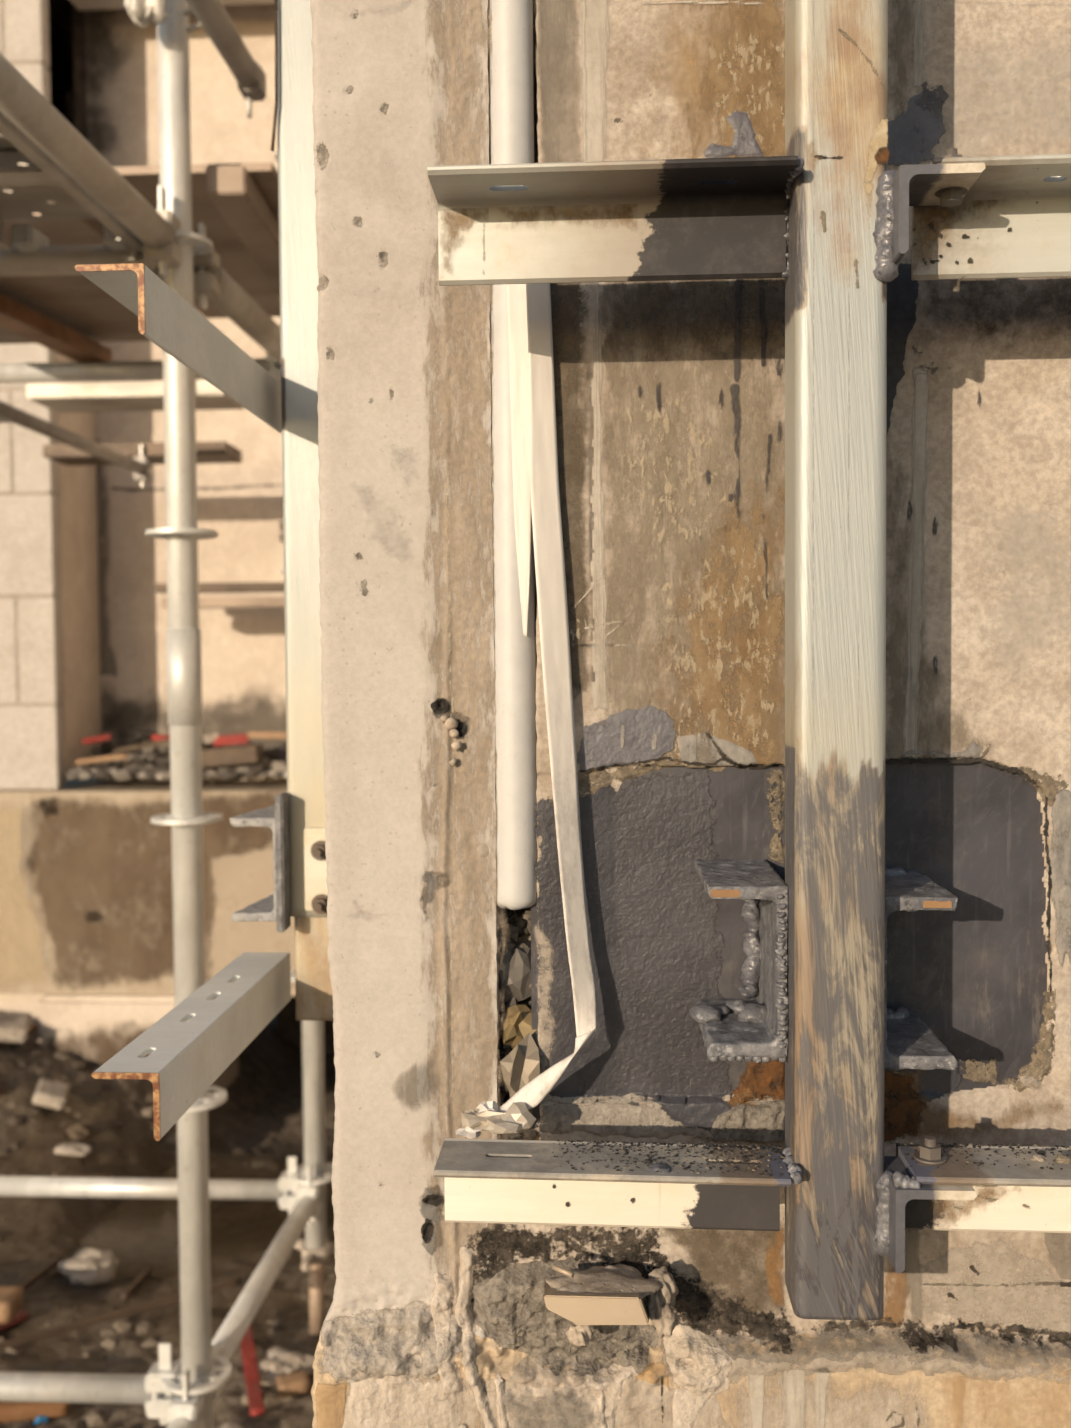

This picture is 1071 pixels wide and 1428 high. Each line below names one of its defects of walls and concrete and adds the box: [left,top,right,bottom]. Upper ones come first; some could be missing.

water stain [538,0,609,163]
water stain [550,278,785,709]
spalling [1019,766,1068,807]
water stain [28,798,174,986]
water stain [202,793,295,987]
peeling [535,927,555,1074]
rust [729,1058,785,1107]
rust [884,1071,982,1142]
rust [960,1059,1000,1085]